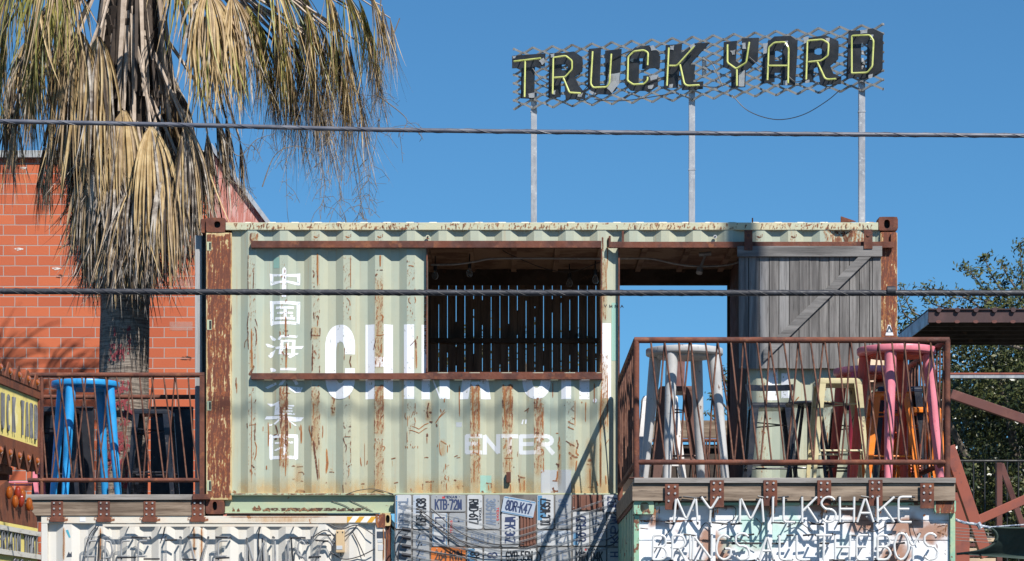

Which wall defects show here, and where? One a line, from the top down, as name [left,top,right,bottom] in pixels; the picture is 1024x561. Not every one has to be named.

rust [373,255,384,367]
rust [231,378,398,517]
rust [405,354,609,493]